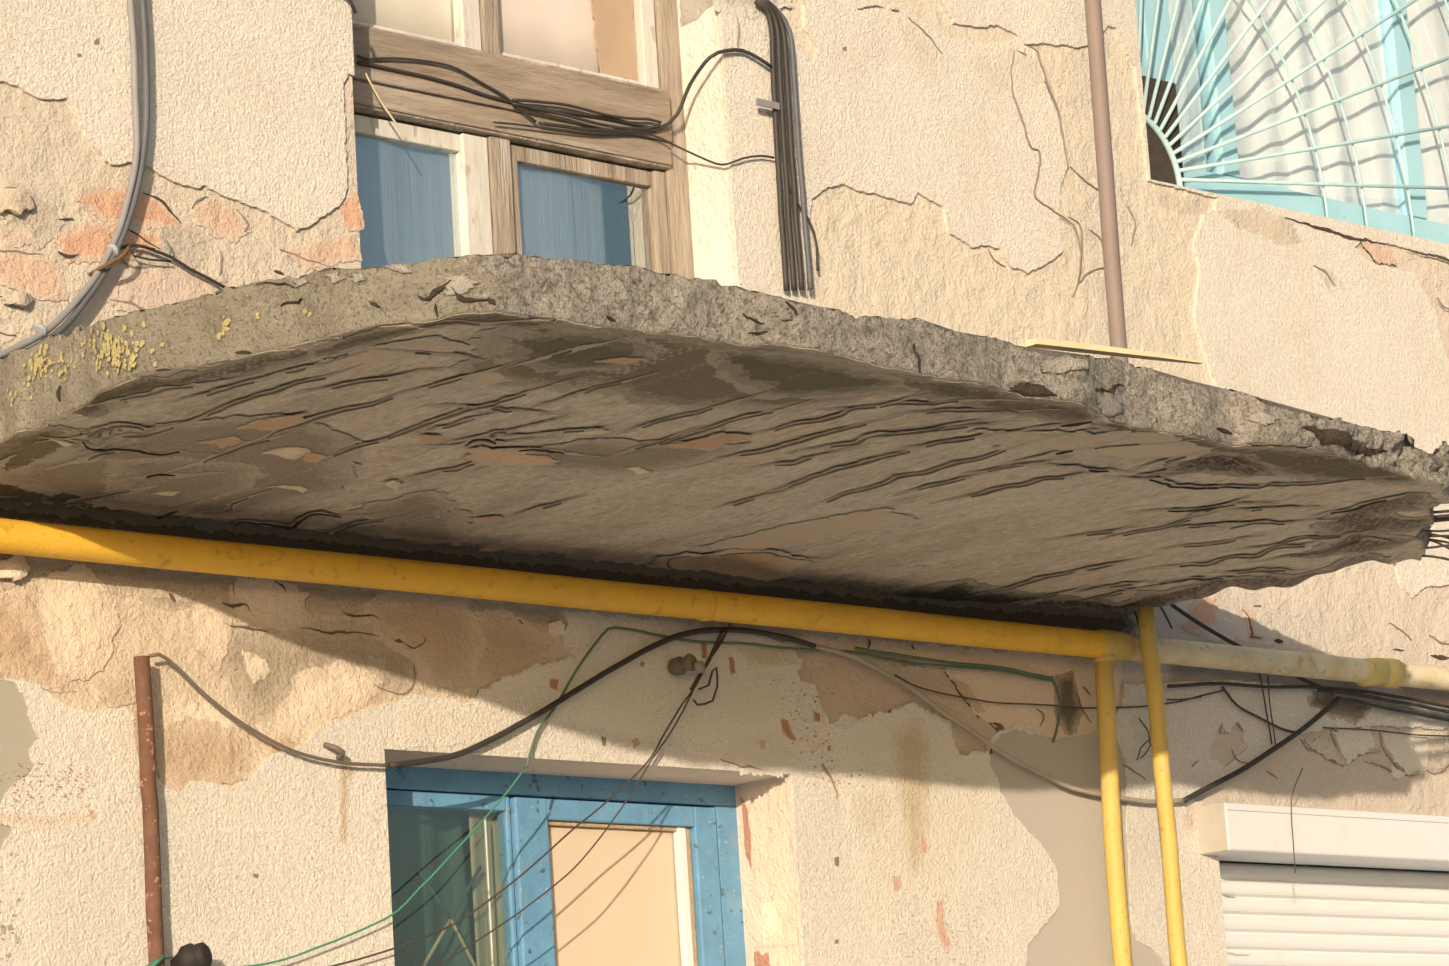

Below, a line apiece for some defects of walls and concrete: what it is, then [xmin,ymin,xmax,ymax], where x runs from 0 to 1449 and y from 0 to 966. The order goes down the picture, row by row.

peeling [0,75,362,358]
crack [64,279,584,506]
crack [743,301,798,334]
crack [635,343,1386,638]
crack [1010,44,1136,297]
spalling [1301,426,1387,456]
crack [1285,217,1449,262]
peeling [0,679,38,805]
peeling [46,594,284,788]
crack [222,577,426,695]
peeling [1035,495,1449,667]
peeling [1193,724,1449,816]